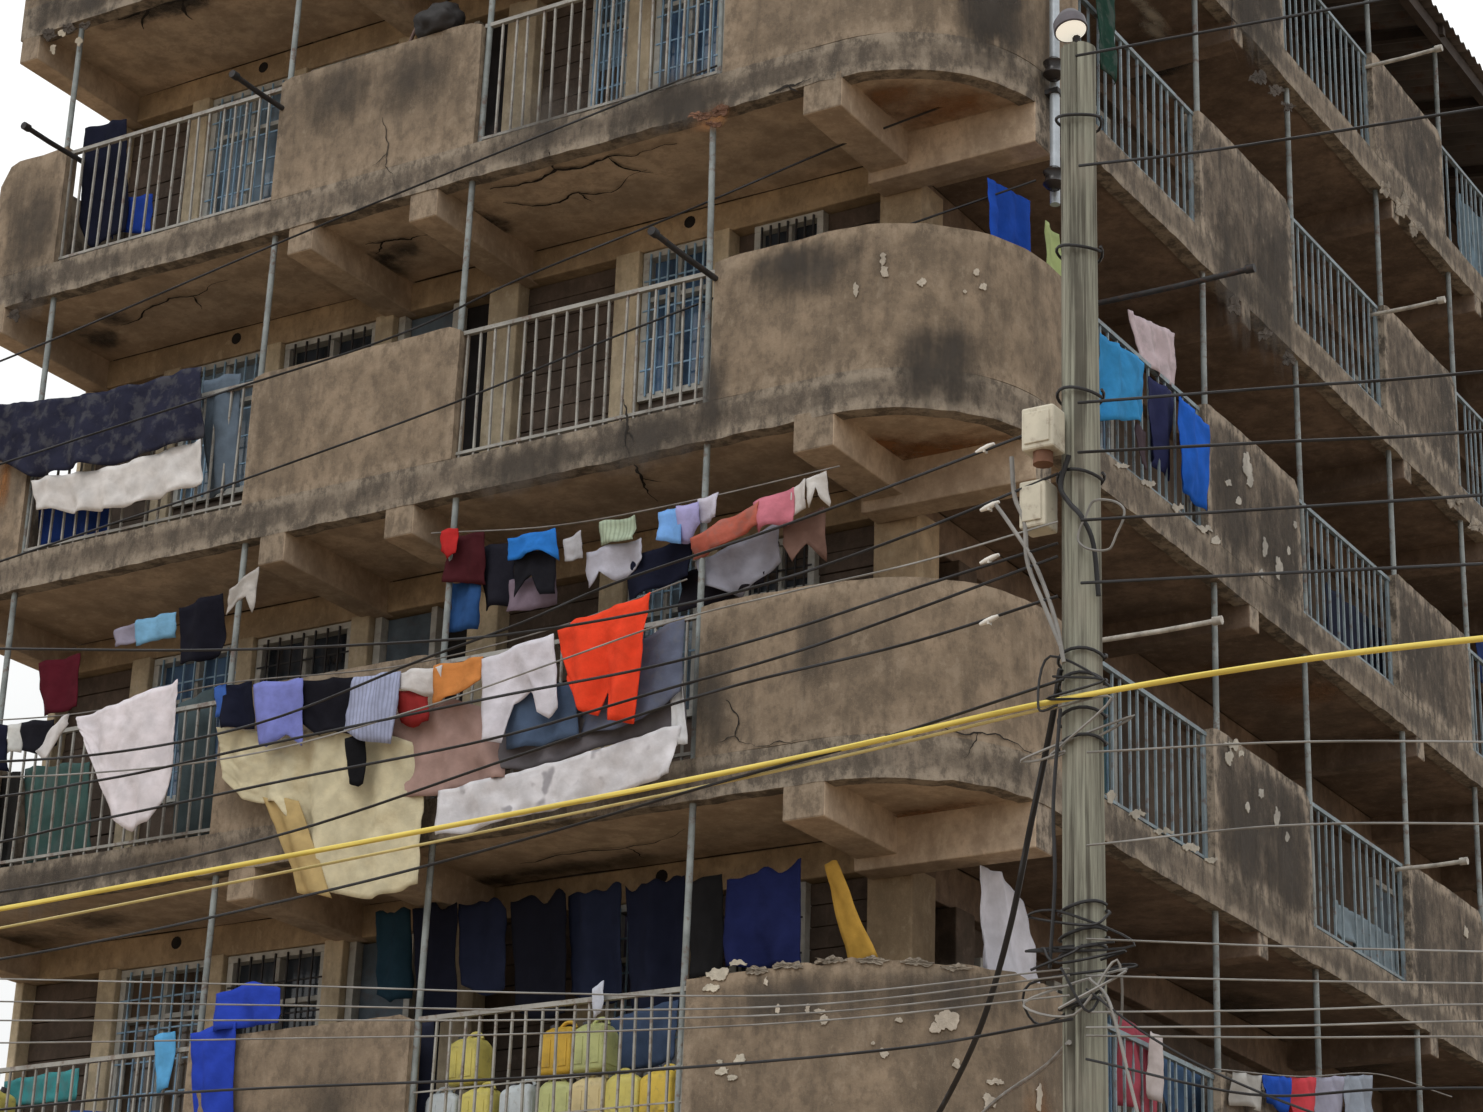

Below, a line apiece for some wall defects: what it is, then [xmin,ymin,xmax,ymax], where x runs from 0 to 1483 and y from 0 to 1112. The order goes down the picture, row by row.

crack [491,143,677,207]
peeling [880,253,889,277]
crack [123,280,226,325]
peeling [1224,452,1254,505]
peeling [1259,537,1291,580]
spalling [702,955,975,993]
peeling [805,1006,829,1025]
peeling [929,1010,959,1033]
peeling [714,1054,746,1081]
peeling [983,1078,1005,1109]